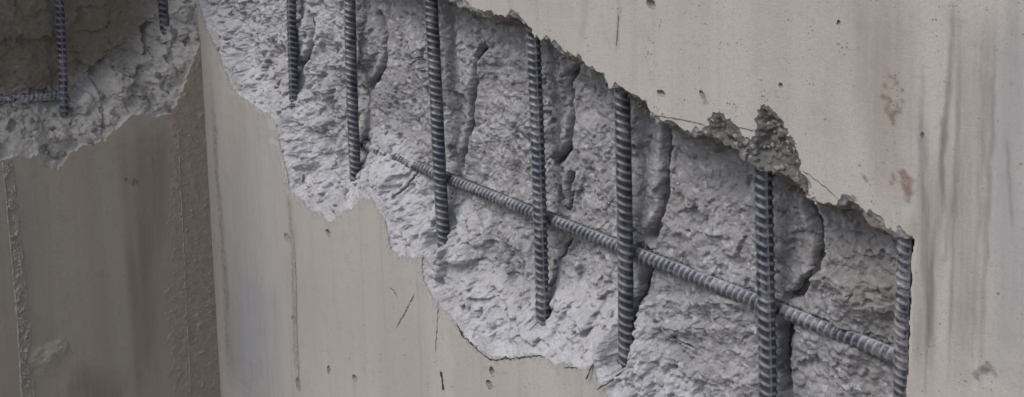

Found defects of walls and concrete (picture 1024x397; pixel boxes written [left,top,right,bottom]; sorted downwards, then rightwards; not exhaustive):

spalling [0,0,200,170]
spalling [197,0,915,397]